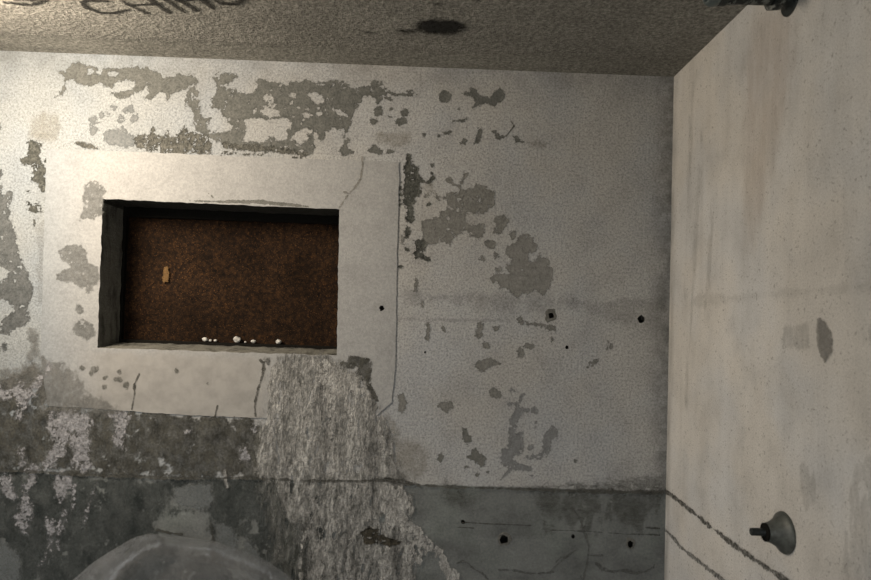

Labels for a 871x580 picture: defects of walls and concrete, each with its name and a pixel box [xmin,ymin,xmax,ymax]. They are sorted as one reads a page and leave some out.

peeling [439,90,451,103]
peeling [464,88,505,108]
peeling [55,61,417,159]
peeling [460,128,524,145]